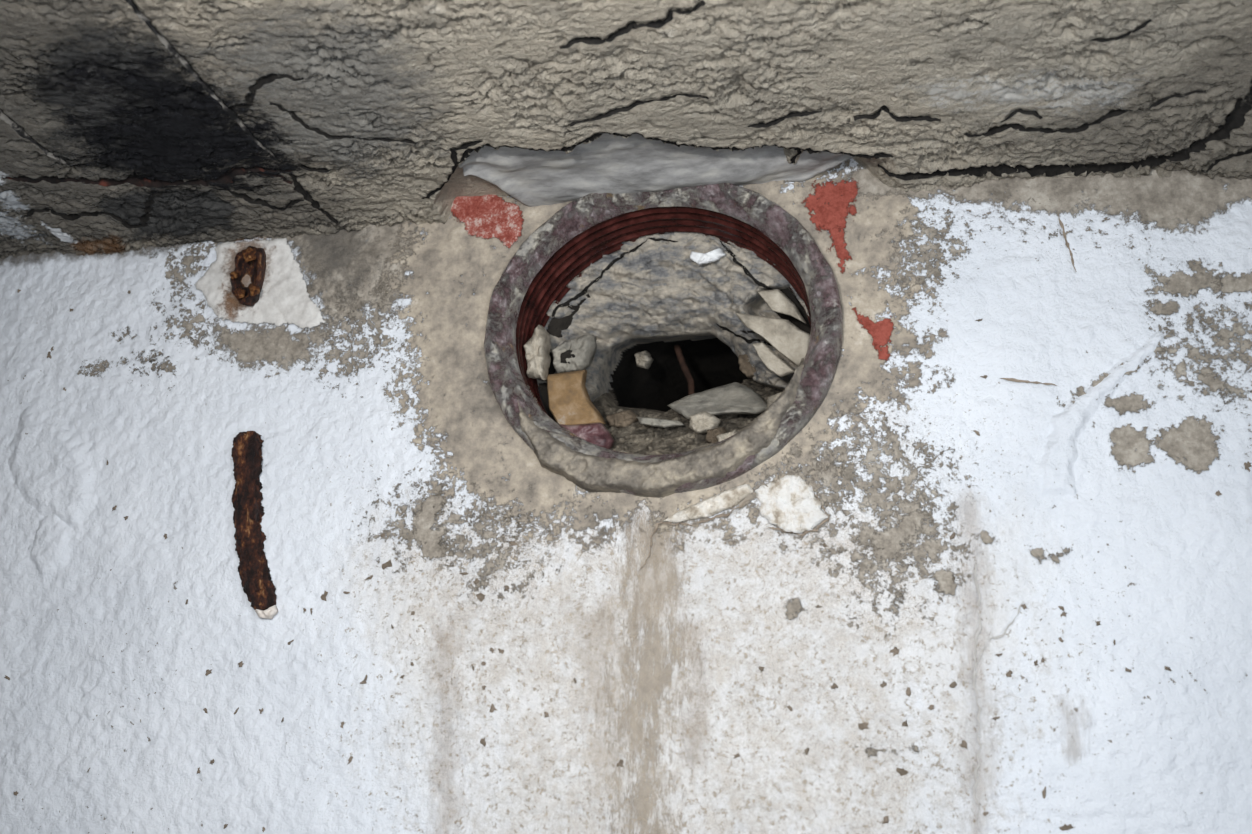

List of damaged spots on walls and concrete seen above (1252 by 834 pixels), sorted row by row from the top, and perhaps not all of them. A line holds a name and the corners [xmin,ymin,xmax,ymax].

crack [560,0,705,49]
crack [1090,19,1152,42]
crack [1,74,418,228]
water stain [0,0,438,287]
crack [421,81,1252,199]
rust [226,242,268,319]
peeling [75,160,1252,656]
rust [237,487,259,521]
water stain [320,436,1106,834]
peeling [855,722,919,776]